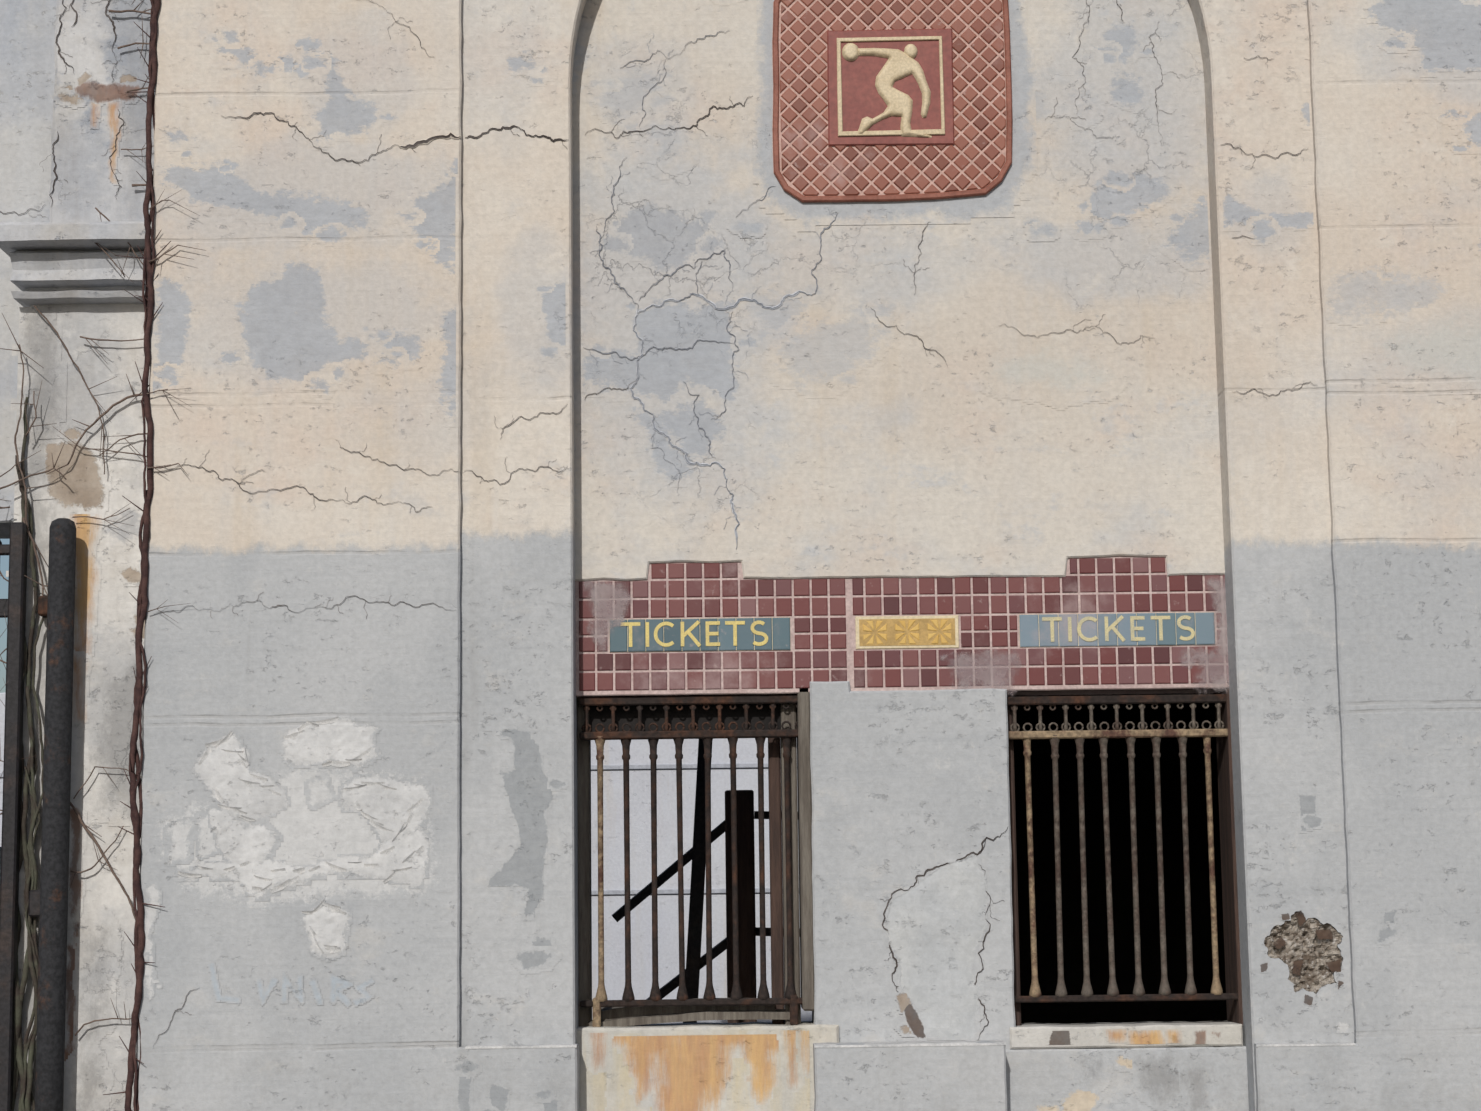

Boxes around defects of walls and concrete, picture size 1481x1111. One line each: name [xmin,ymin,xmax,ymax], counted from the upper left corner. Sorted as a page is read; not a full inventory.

crack [0,131,68,217]
crack [55,0,124,196]
corrosion [88,99,126,185]
crack [1051,0,1177,138]
crack [1221,143,1302,167]
crack [162,30,837,549]
crack [158,592,450,619]
peeling [173,715,433,901]
peeling [295,899,353,963]
crack [882,827,1008,1037]
spalling [1260,911,1344,1006]
corrosion [584,1030,810,1111]